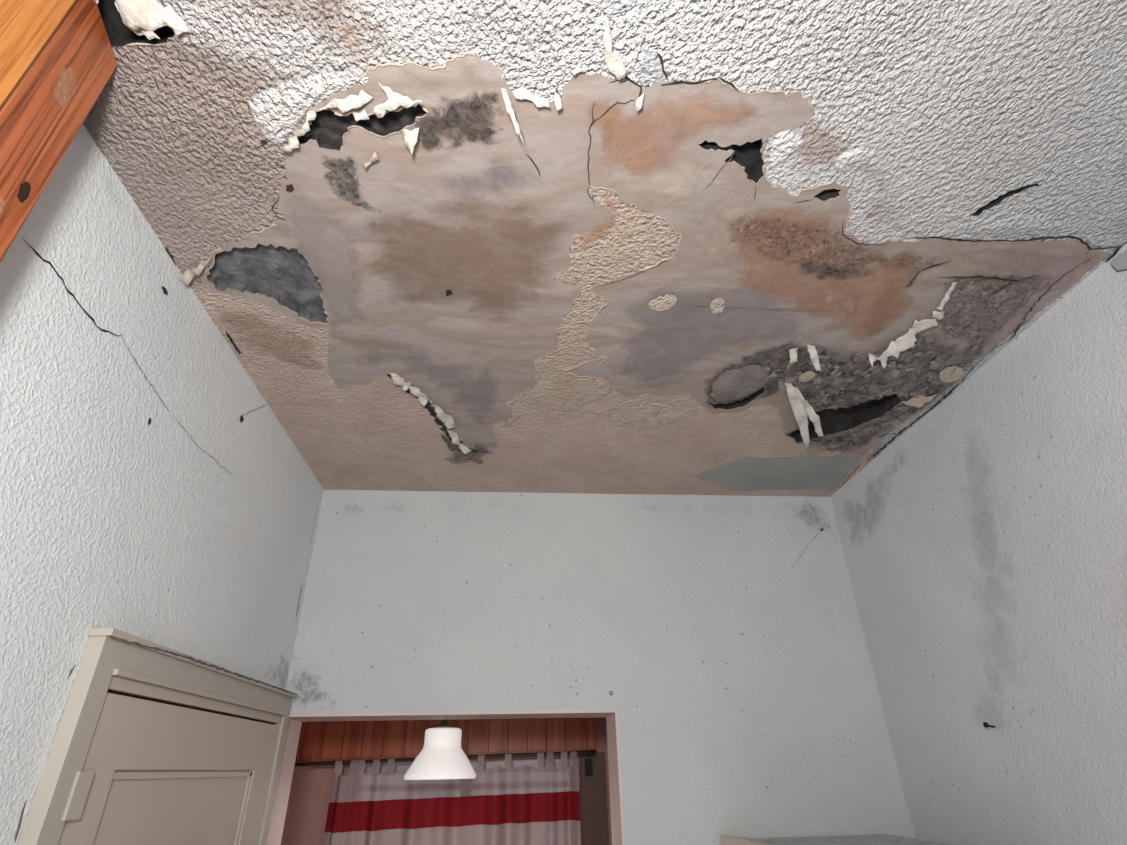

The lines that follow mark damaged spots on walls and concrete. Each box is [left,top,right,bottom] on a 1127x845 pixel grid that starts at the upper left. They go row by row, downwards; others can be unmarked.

flaking render [96,0,190,47]
crack [22,238,230,473]
water stain [83,38,880,497]
peeling [165,16,1127,491]
crack [841,183,1127,487]